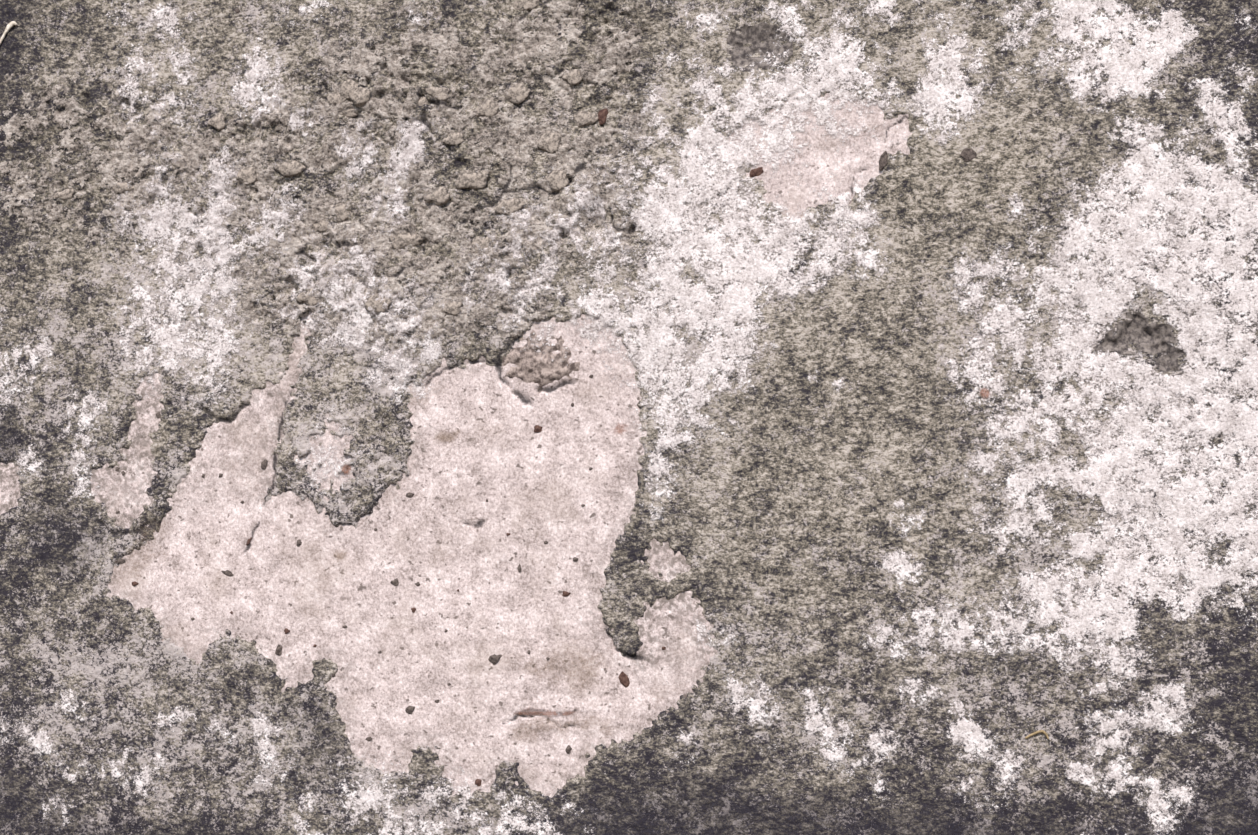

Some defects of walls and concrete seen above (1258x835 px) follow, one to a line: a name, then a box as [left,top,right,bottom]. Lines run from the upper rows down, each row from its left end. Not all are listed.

leakage [295,406,373,503]
spalling [0,0,718,798]
leakage [453,0,1258,834]